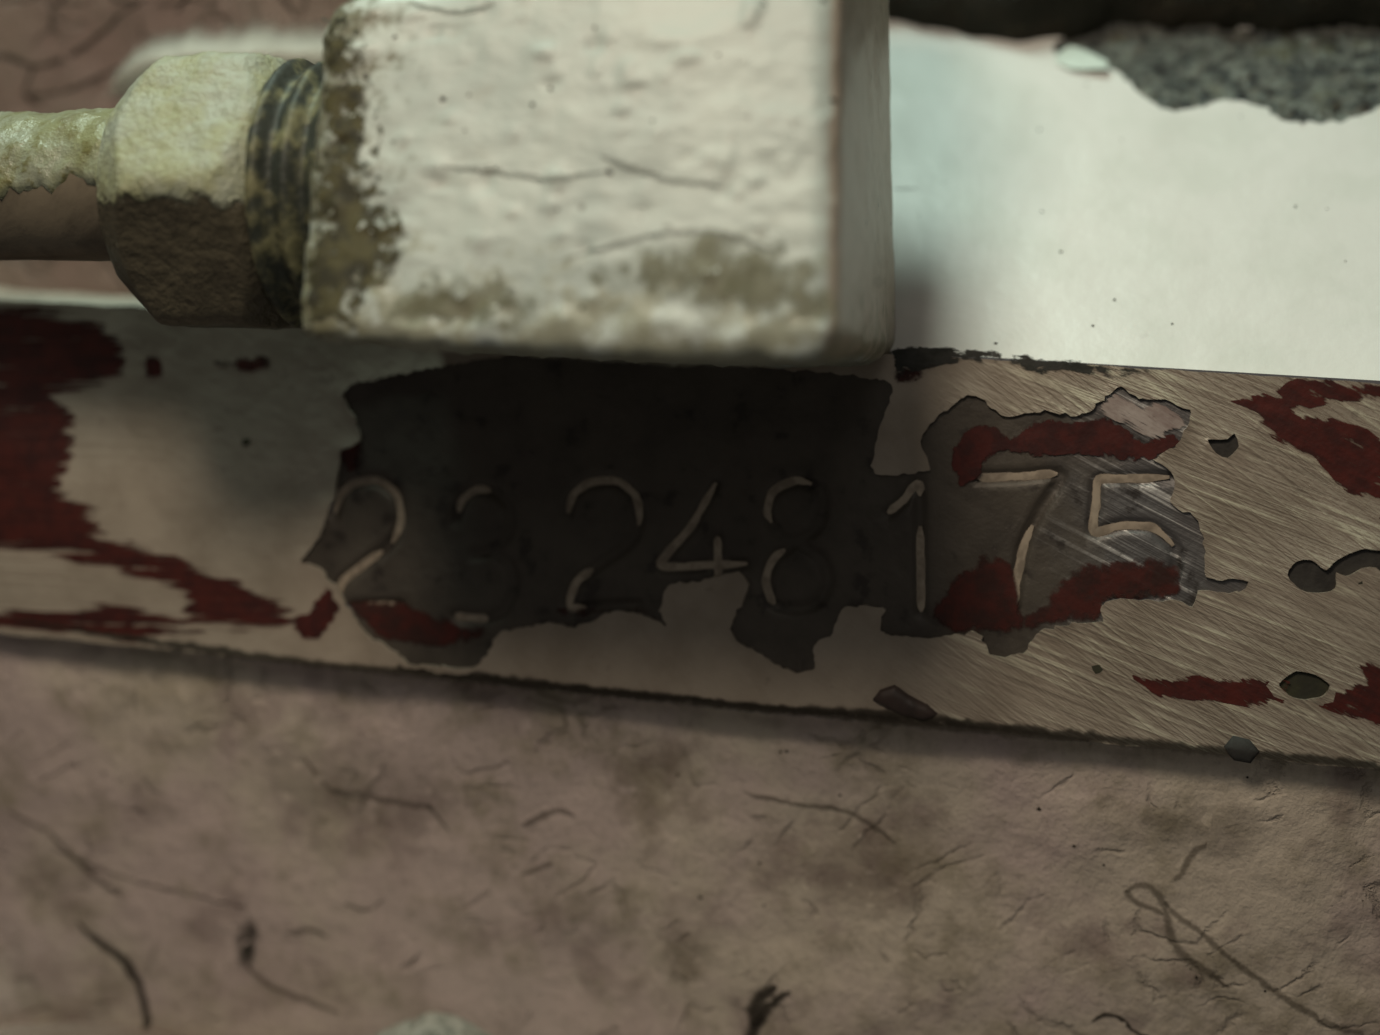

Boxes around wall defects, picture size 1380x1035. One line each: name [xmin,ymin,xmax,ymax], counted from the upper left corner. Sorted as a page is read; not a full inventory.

crack [0,0,145,105]
peeling [303,346,1248,673]
peeling [1288,549,1380,593]
peeling [376,1012,490,1035]
crack [746,985,790,1035]
crack [1092,1013,1145,1035]